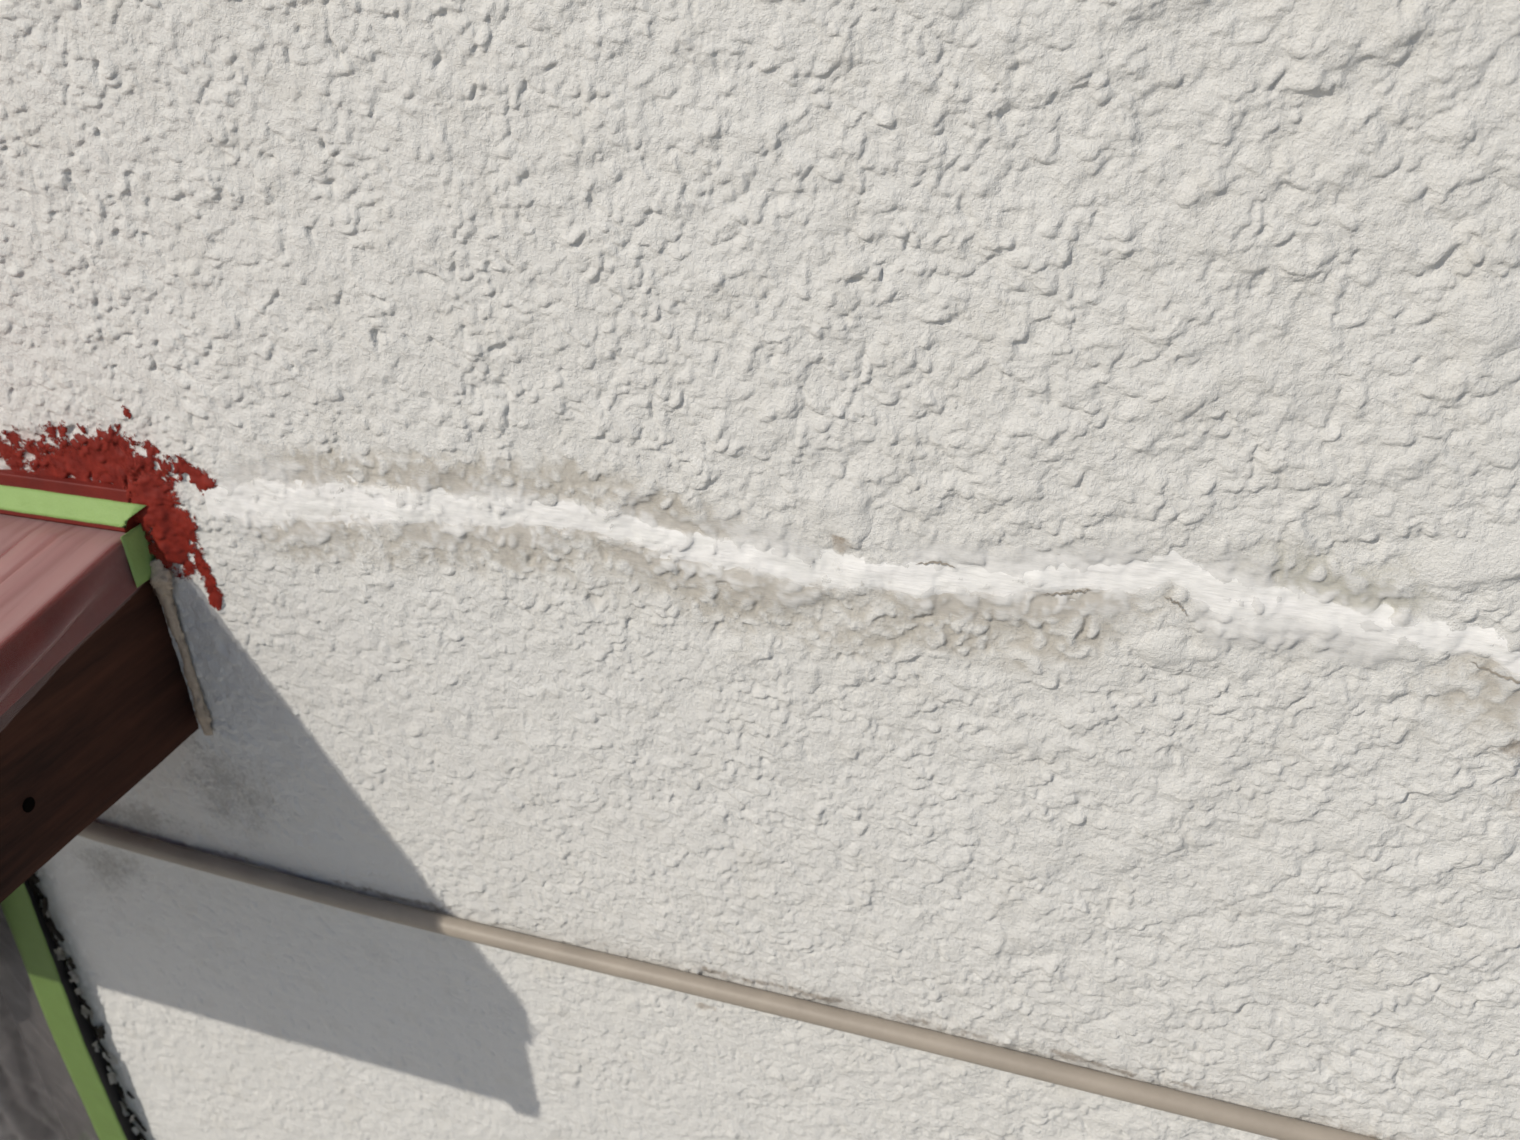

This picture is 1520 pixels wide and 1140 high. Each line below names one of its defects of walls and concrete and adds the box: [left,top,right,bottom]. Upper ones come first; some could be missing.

crack [202,460,1520,706]